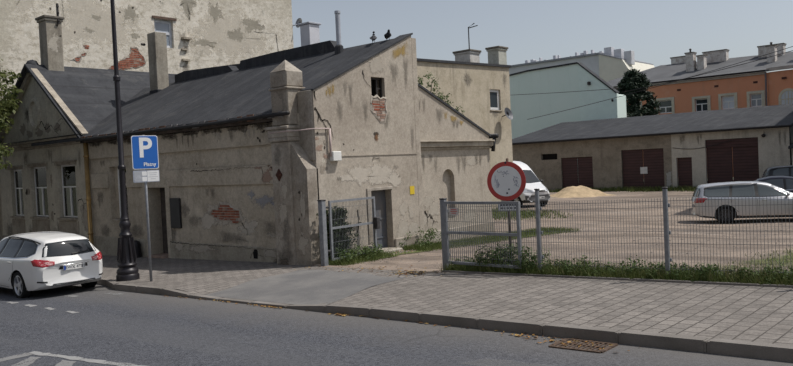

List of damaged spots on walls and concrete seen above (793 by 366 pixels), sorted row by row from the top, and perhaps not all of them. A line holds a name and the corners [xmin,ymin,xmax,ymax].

flaking render [370,95,387,139]
flaking render [209,201,242,225]